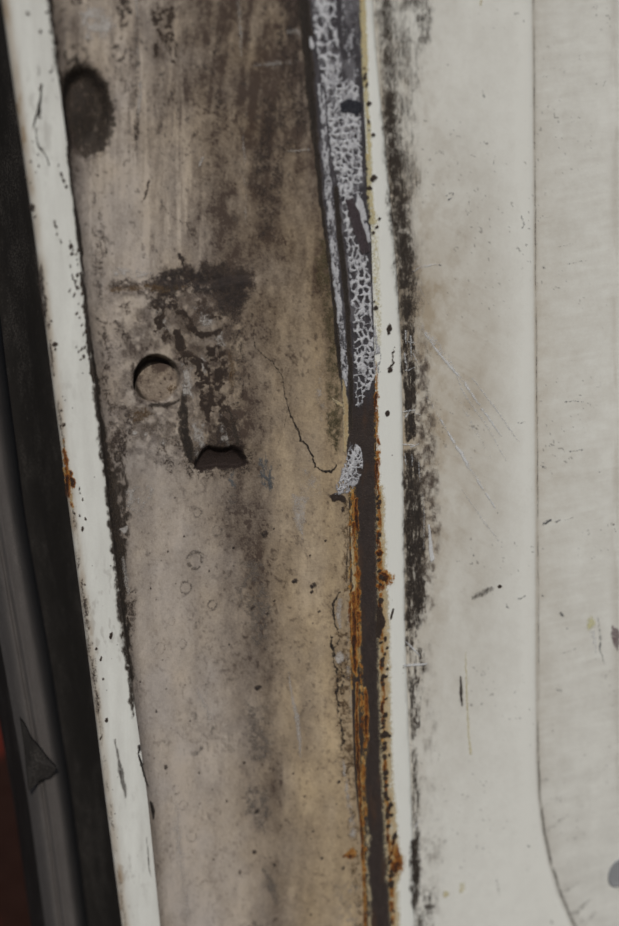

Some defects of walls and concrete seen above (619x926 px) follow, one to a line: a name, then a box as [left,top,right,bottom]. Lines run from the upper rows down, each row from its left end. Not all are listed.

spalling [340,99,363,117]
spalling [346,198,369,255]
corrosion [59,411,76,508]
damp [47,0,256,716]
crack [254,342,363,495]
damp [378,0,440,926]
corrosion [333,363,404,926]